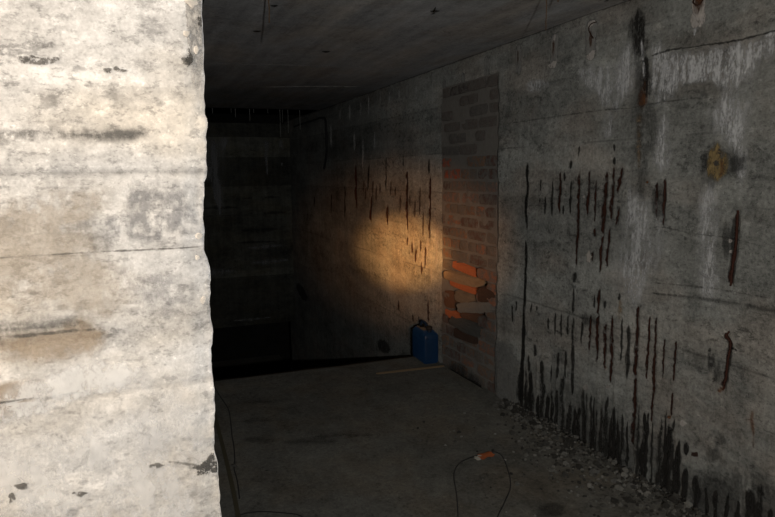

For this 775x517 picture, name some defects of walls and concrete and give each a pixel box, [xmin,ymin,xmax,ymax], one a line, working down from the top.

damp [579,10,773,104]
damp [65,129,142,140]
damp [623,198,647,294]
rust [539,145,677,444]
damp [520,345,773,517]